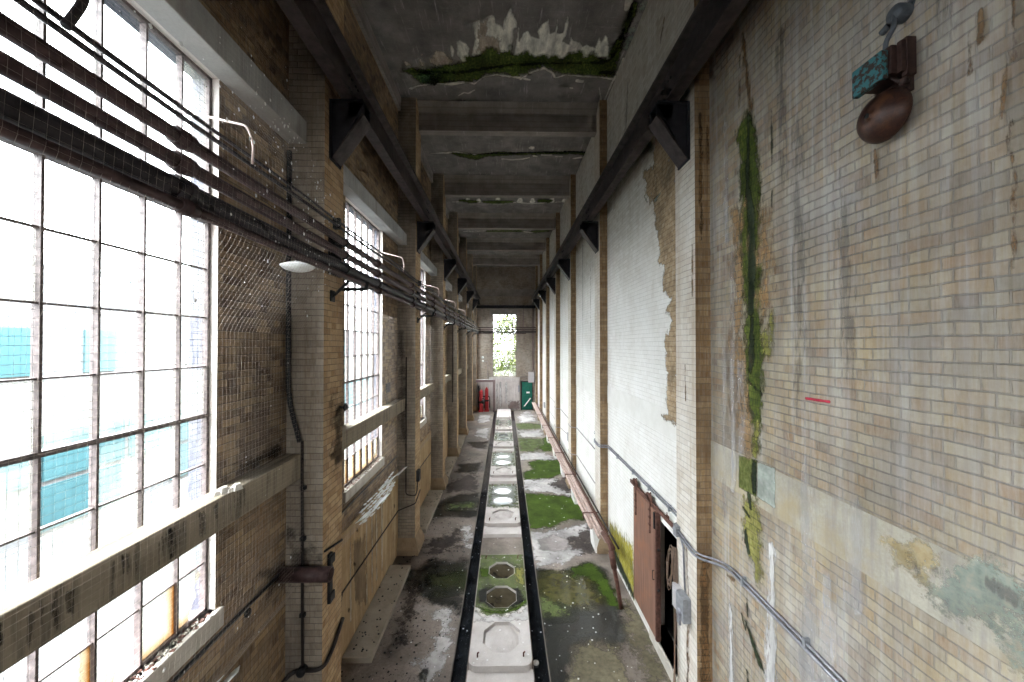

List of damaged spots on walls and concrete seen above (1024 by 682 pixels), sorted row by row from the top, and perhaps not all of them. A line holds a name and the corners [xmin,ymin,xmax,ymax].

peeling [643,138,676,425]
water stain [739,113,762,419]
water stain [757,463,775,508]
water stain [881,536,1024,668]